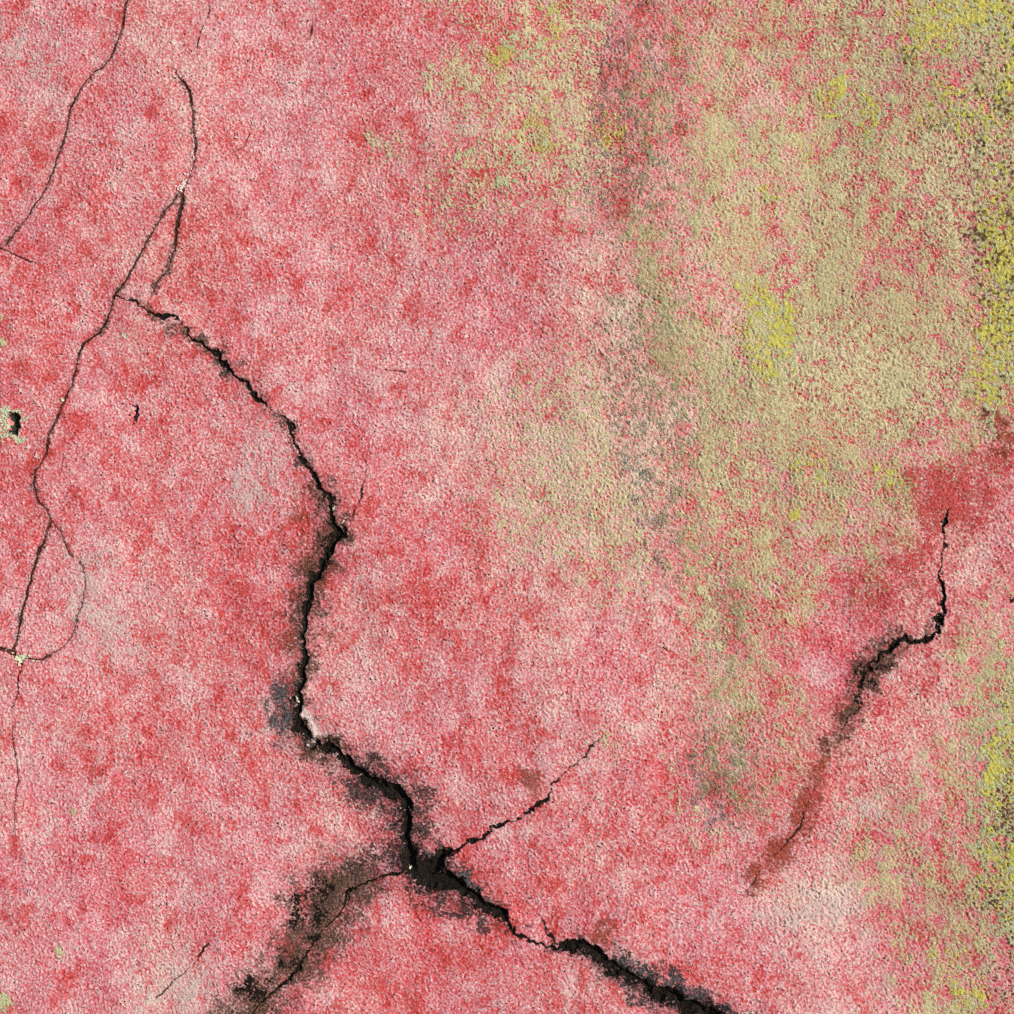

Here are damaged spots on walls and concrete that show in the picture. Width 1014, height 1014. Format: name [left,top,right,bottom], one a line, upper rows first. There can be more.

crack [0,0,128,263]
crack [0,70,762,1014]
crack [742,508,951,897]